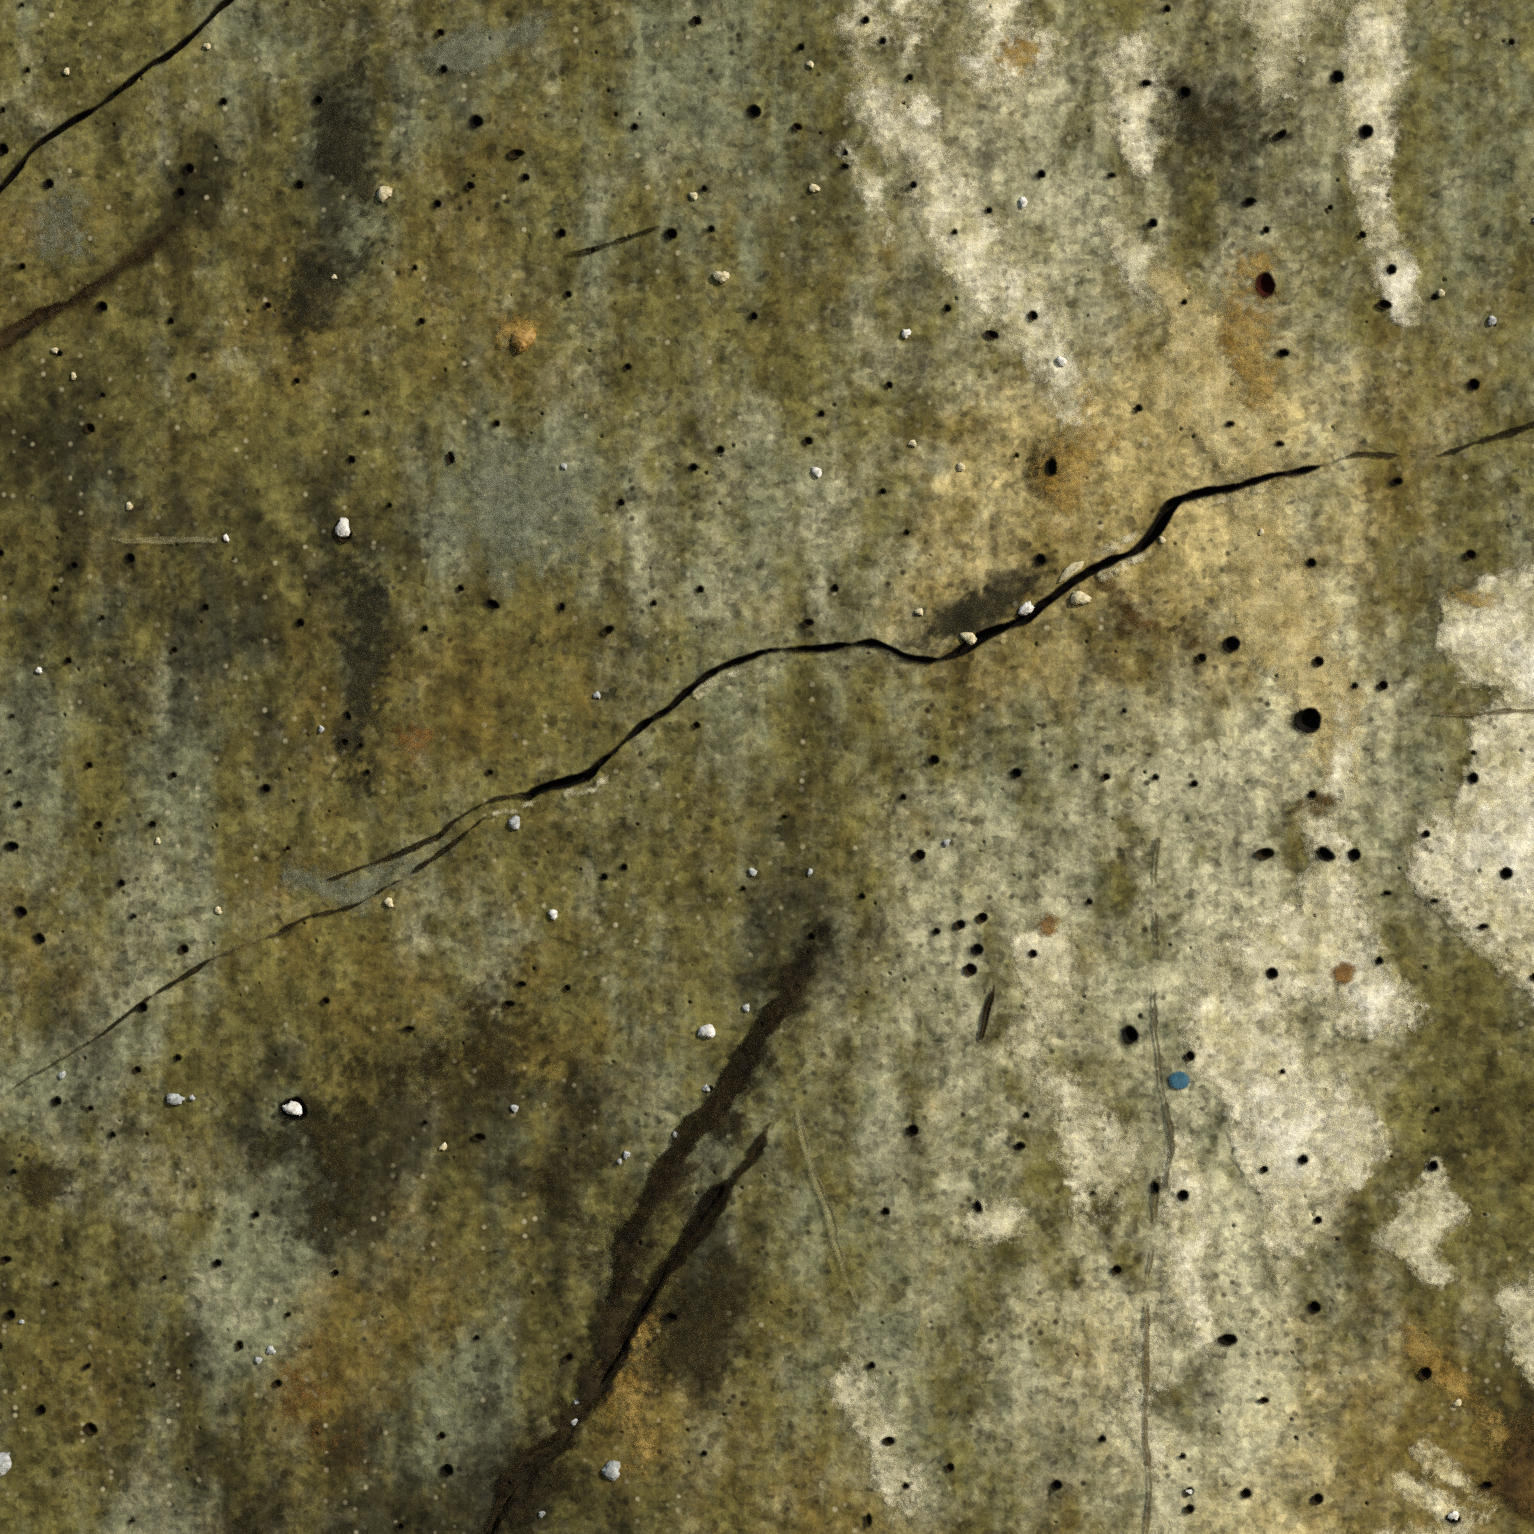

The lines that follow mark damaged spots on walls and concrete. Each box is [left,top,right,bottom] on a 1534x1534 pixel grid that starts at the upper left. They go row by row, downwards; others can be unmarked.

crack [0,226,173,352]
crack [0,0,234,193]
damp [833,0,938,69]
damp [843,85,1096,426]
damp [957,0,1070,93]
damp [1102,30,1167,174]
damp [1241,0,1420,326]
crack [9,421,1534,1092]
crack [481,919,833,1534]
crack [1143,837,1175,1534]